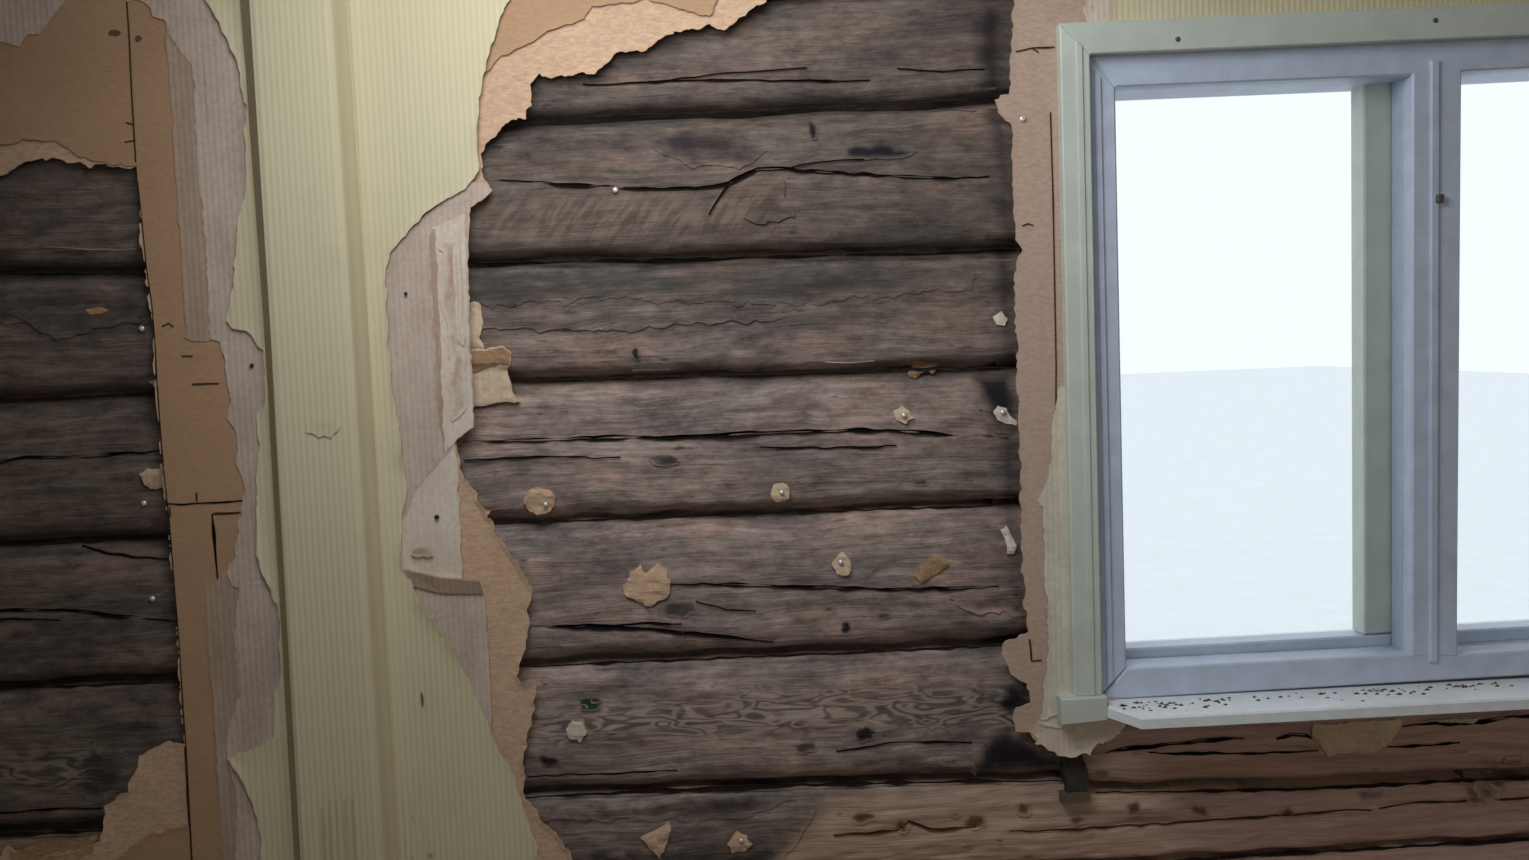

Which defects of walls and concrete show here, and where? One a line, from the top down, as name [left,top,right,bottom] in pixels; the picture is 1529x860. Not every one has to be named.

crack [487,159,989,215]
crack [0,450,163,463]
crack [0,608,178,622]